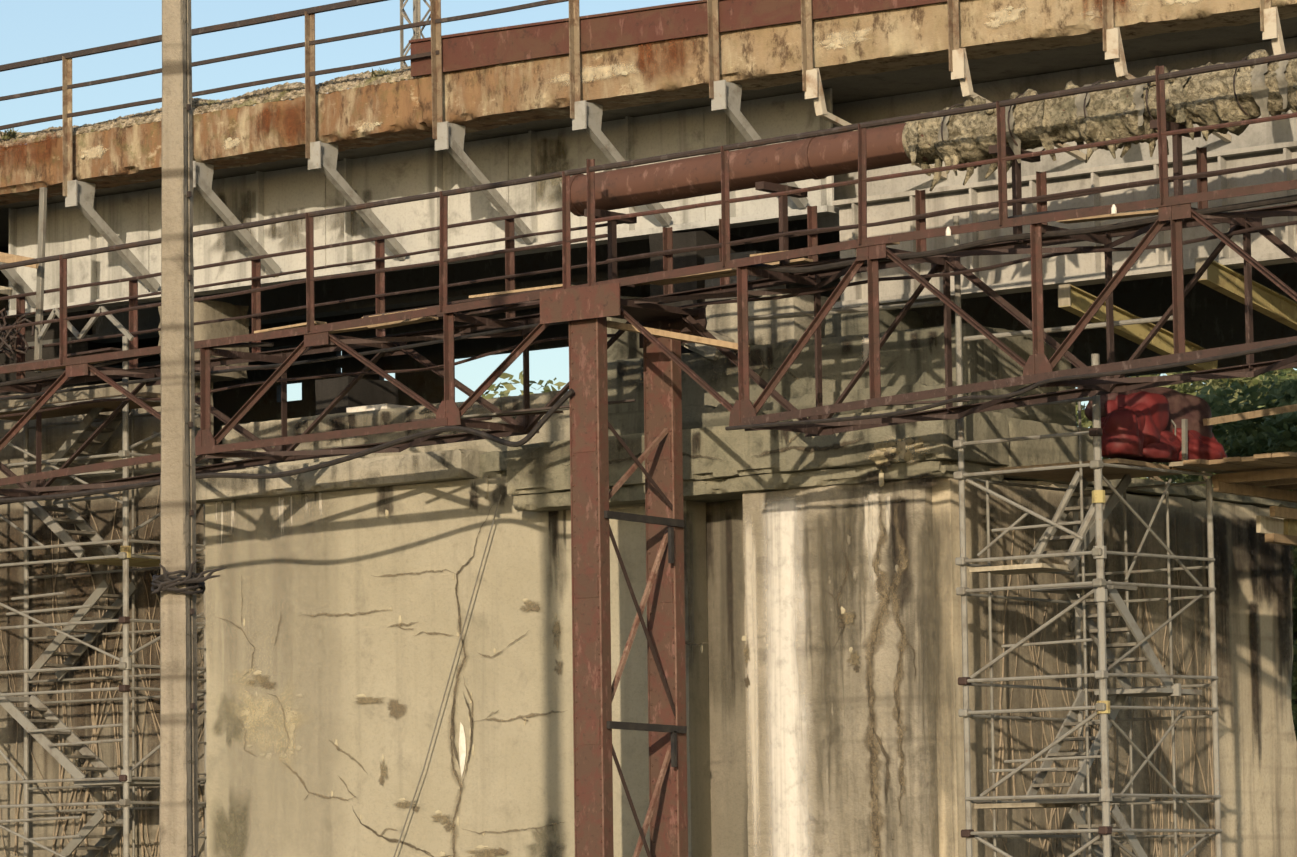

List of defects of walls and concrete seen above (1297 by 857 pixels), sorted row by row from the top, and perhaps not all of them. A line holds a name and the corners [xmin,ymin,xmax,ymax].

rust [262,109,302,140]
spalling [859,437,939,487]
crack [186,585,194,717]
peeling [237,670,303,760]
crack [221,521,559,857]
water stain [706,492,952,857]
water stain [971,492,1294,857]